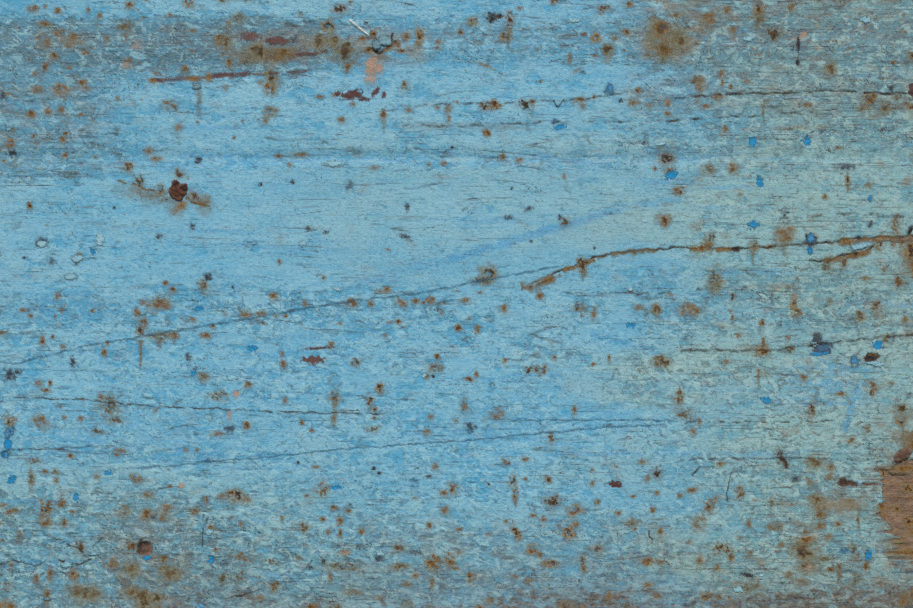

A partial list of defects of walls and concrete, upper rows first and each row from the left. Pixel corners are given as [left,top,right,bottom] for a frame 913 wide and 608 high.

rust [645,12,691,61]
rust [26,83,70,118]
rust [118,162,210,214]
crack [521,215,913,293]
rust [456,267,497,302]
rust [367,383,383,431]
rust [895,405,913,450]
rust [192,489,251,514]
rust [531,504,582,538]
peeling [838,446,913,572]
rust [514,543,557,582]
rust [850,545,869,585]